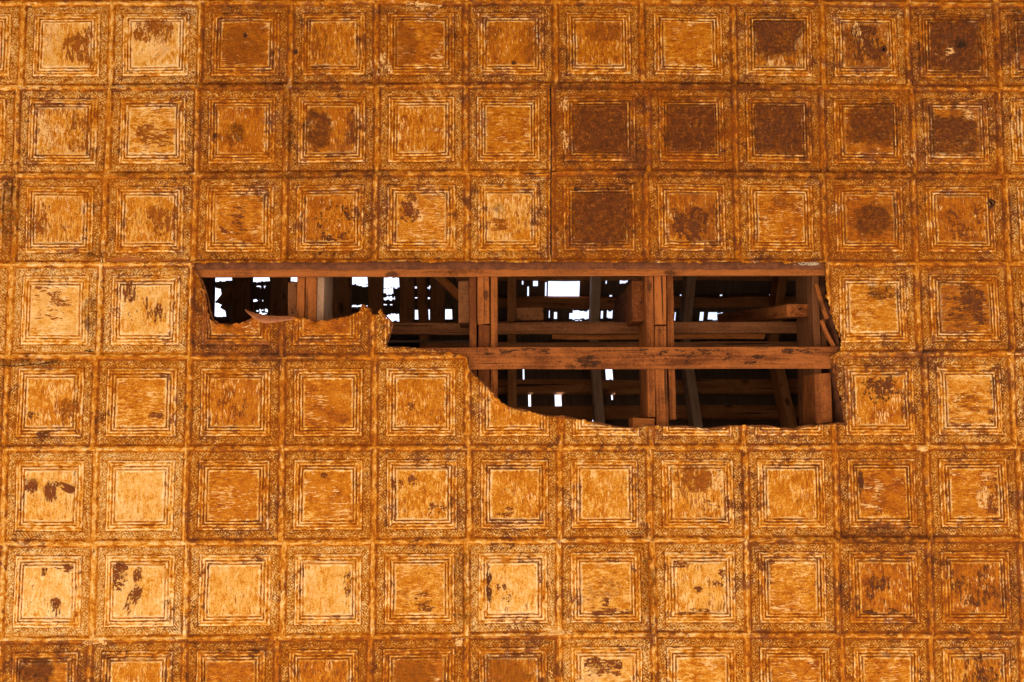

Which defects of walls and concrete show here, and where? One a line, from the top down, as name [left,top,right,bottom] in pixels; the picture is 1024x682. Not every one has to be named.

corrosion [284,109,332,150]
corrosion [560,84,633,158]
corrosion [629,81,763,179]
corrosion [847,99,900,145]
corrosion [570,187,633,248]
corrosion [854,203,893,236]
peeling [743,348,821,364]
peeling [217,387,247,418]